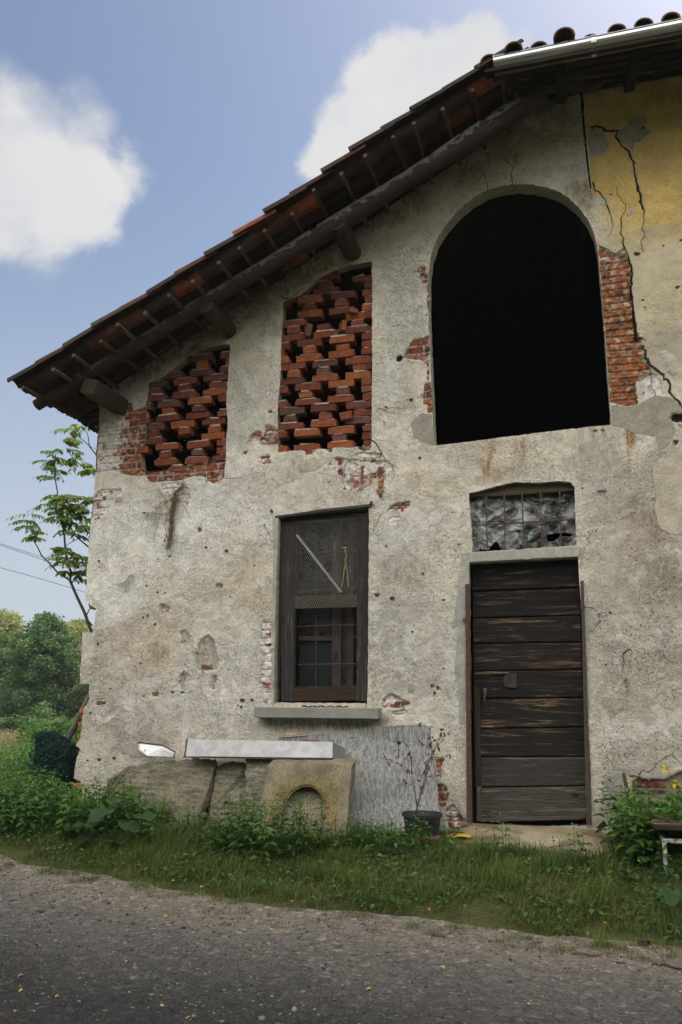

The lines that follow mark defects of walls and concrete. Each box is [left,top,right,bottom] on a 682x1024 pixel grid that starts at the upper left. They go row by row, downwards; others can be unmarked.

crack [580,93,682,416]
spalling [396,267,433,413]
spalling [598,248,661,407]
spalling [93,403,226,505]
spalling [305,444,393,496]
spalling [260,620,273,703]
flaking render [383,694,410,715]
flaking render [436,759,467,830]